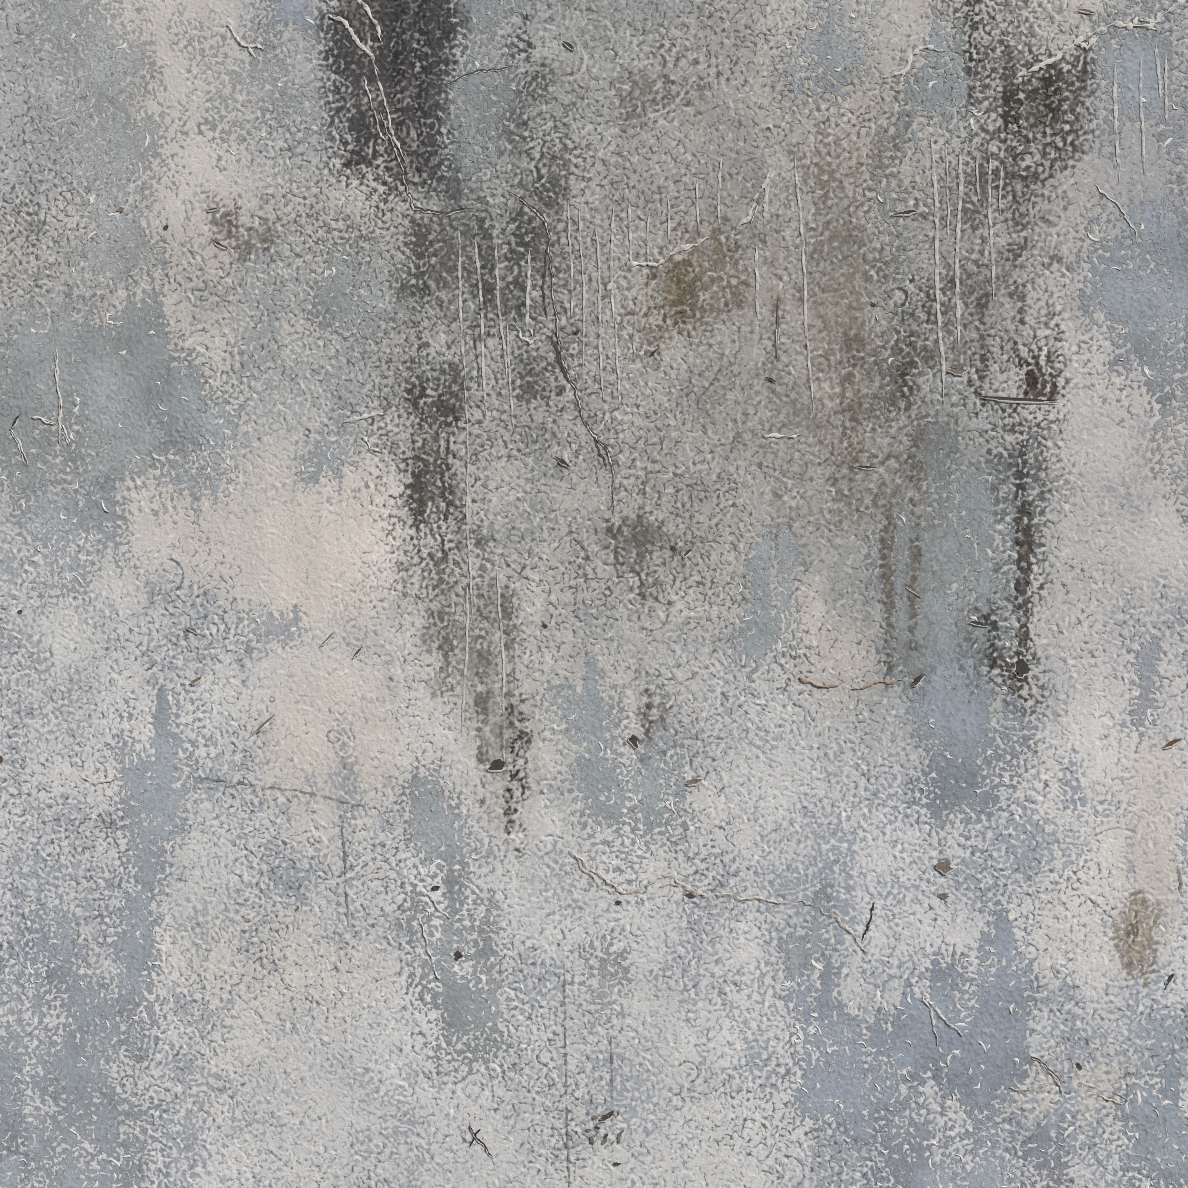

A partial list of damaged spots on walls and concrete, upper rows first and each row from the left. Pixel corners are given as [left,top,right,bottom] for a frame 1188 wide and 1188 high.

crack [226,24,263,57]
crack [328,0,474,216]
damp [763,171,771,222]
crack [1014,0,1186,80]
damp [319,0,759,853]
damp [793,0,1093,703]